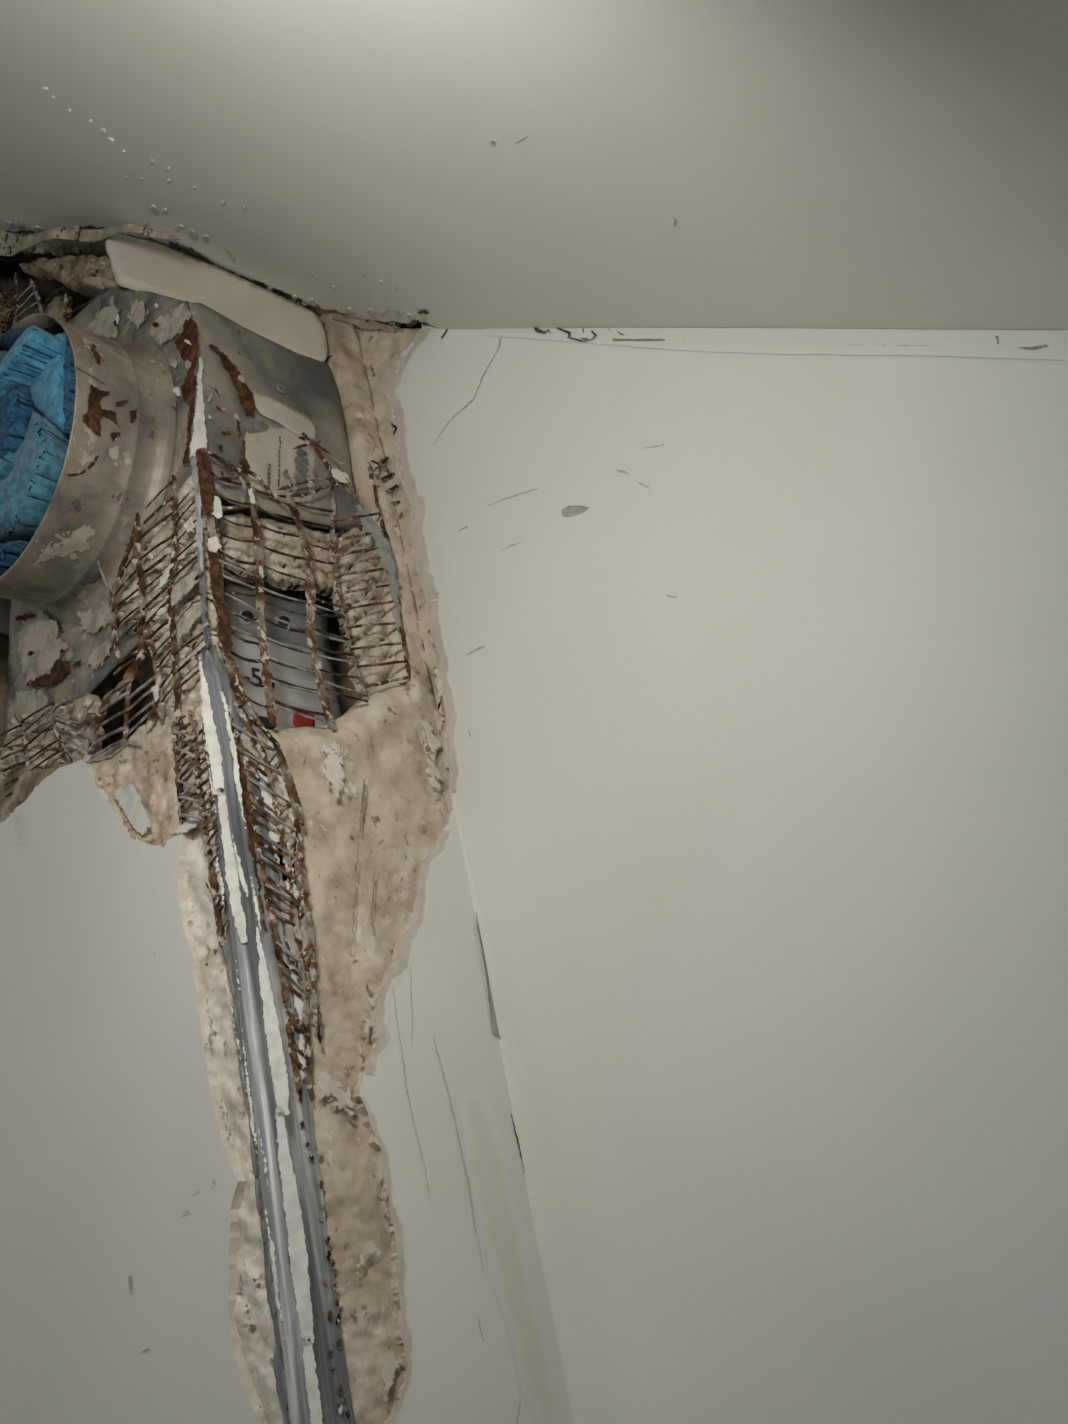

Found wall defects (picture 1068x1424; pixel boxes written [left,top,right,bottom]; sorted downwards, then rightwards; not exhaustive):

rust [67,384,139,477]
rust [171,318,256,514]
rust [15,610,64,633]
rust [136,545,171,603]
rust [195,552,234,653]
rust [26,659,83,687]
spalling [0,204,463,1424]
rust [234,739,268,931]